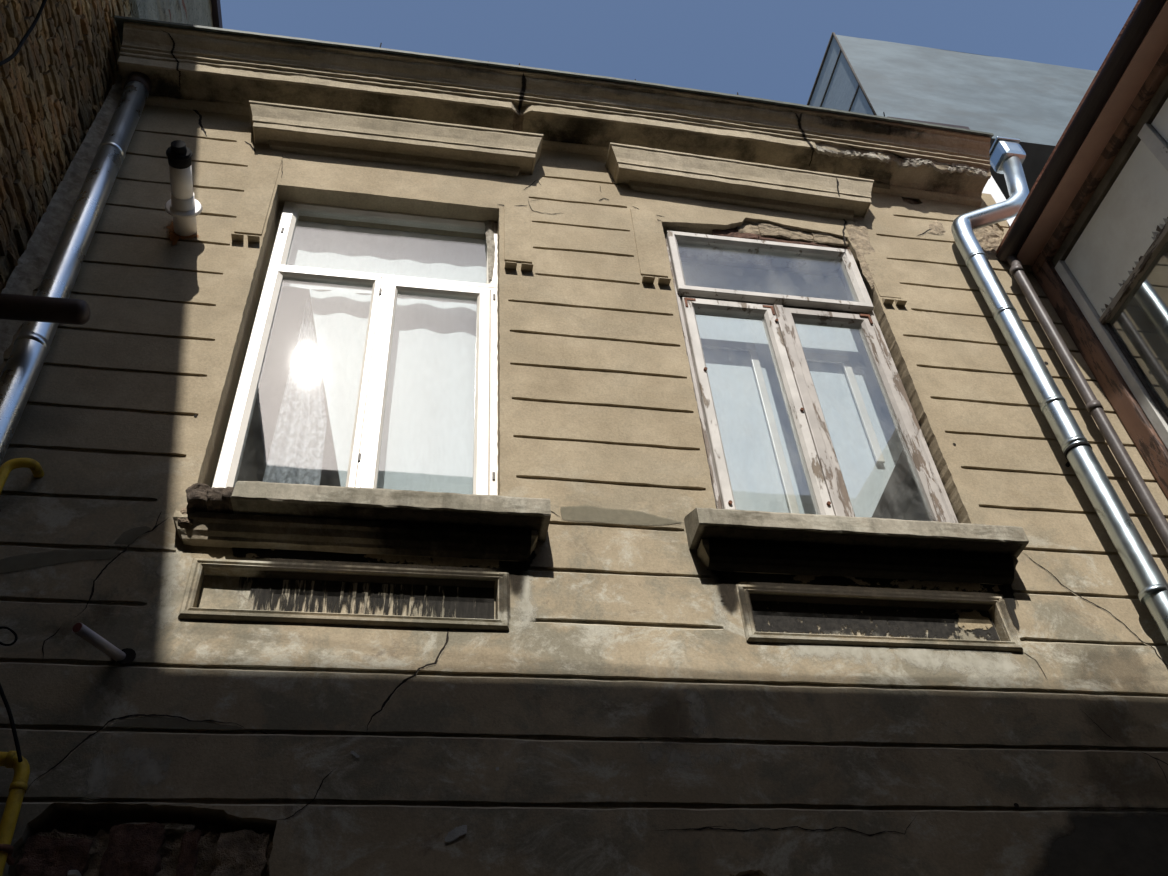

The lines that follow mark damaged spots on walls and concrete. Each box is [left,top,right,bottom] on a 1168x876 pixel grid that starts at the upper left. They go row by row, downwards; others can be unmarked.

crack [162,0,207,137]
crack [518,73,527,113]
crack [793,112,815,167]
spalling [816,142,988,179]
crack [836,177,847,246]
spalling [712,217,875,288]
crack [42,511,169,657]
crack [1022,552,1168,667]
crack [366,614,454,737]
crack [24,714,279,796]
spalling [8,818,274,876]
crack [657,818,915,836]